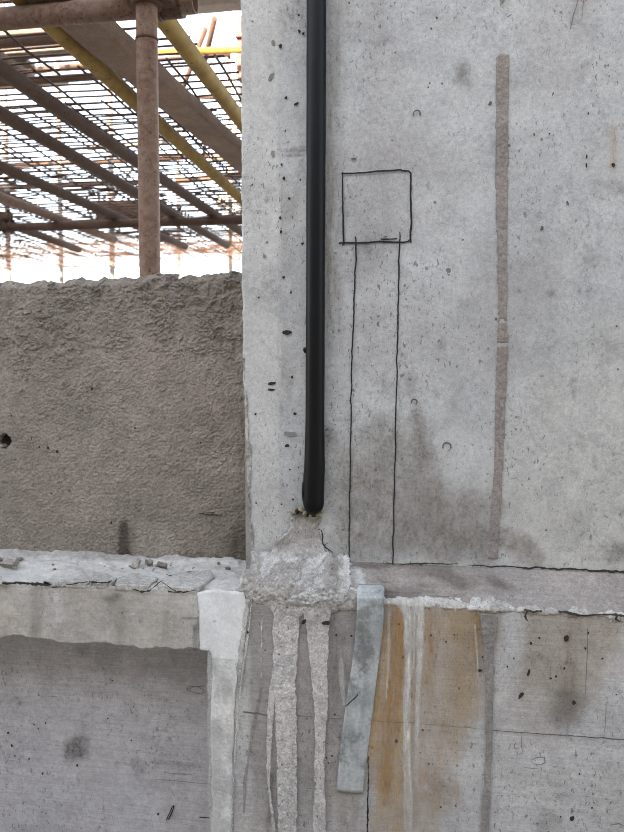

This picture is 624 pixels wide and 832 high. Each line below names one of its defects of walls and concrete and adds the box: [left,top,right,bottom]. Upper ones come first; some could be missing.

peeling [43,358,358,832]
damp [266,664,276,832]
corrosion [369,611,409,809]
crack [378,715,624,740]
crack [386,562,624,573]
crack [524,609,624,694]